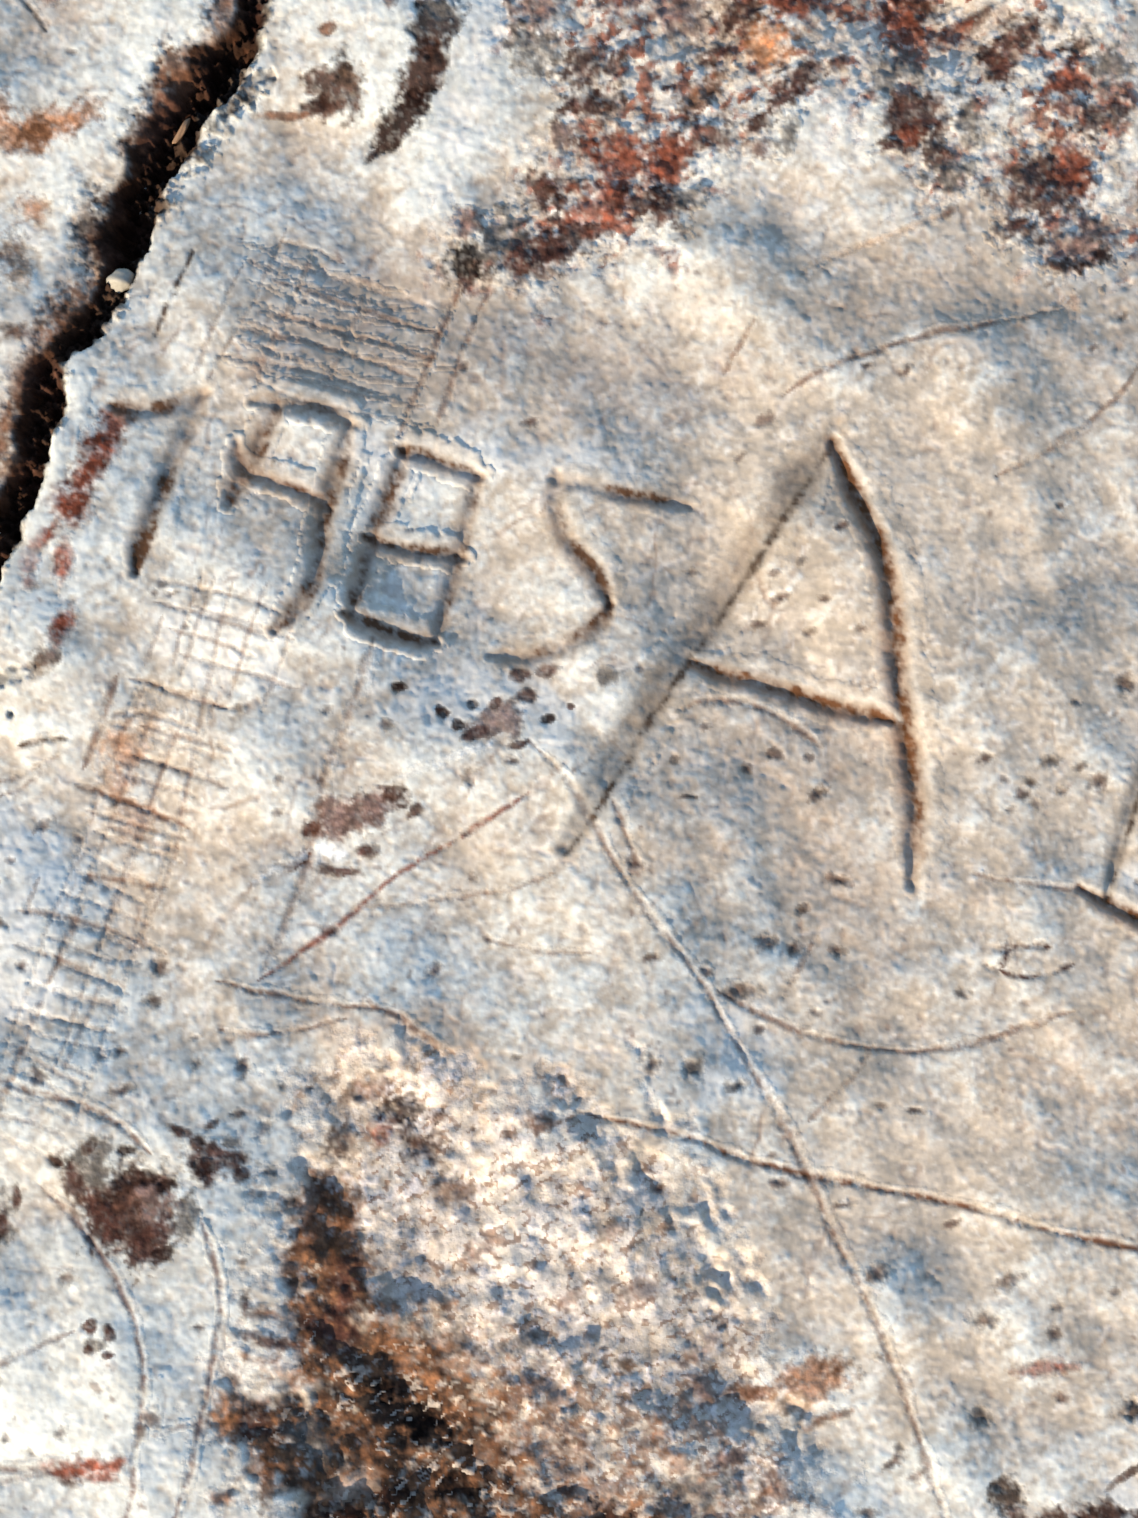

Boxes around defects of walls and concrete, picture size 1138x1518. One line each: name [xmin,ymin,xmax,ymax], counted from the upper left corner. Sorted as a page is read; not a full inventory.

crack [0,0,296,720]